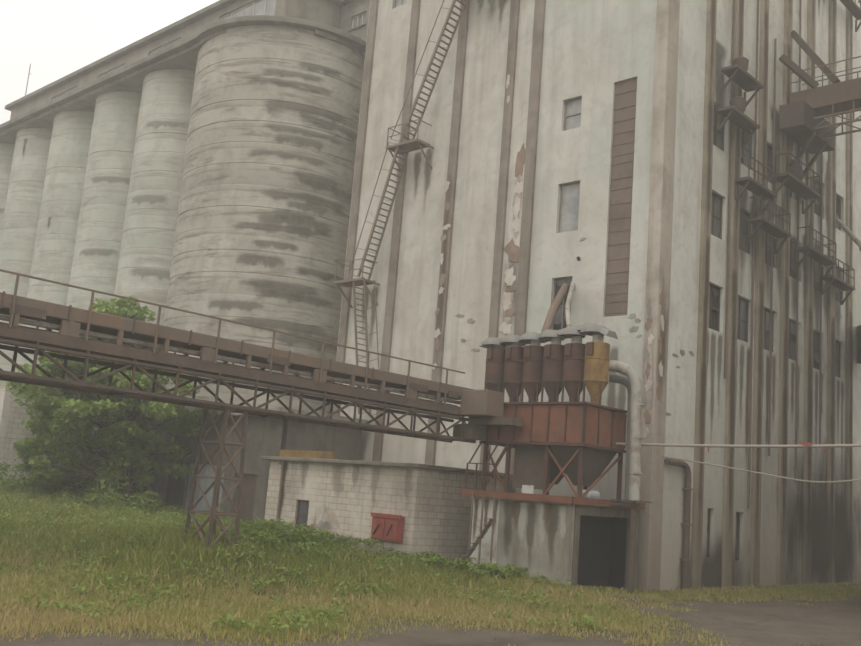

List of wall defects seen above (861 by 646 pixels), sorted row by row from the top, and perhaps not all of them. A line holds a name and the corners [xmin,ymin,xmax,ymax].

leakage [255,63,337,92]
leakage [212,301,337,350]
leakage [253,281,327,305]
leakage [239,101,357,266]
spalling [435,181,451,317]
spalling [498,143,526,335]
spalling [628,291,694,438]
leakage [739,110,841,330]